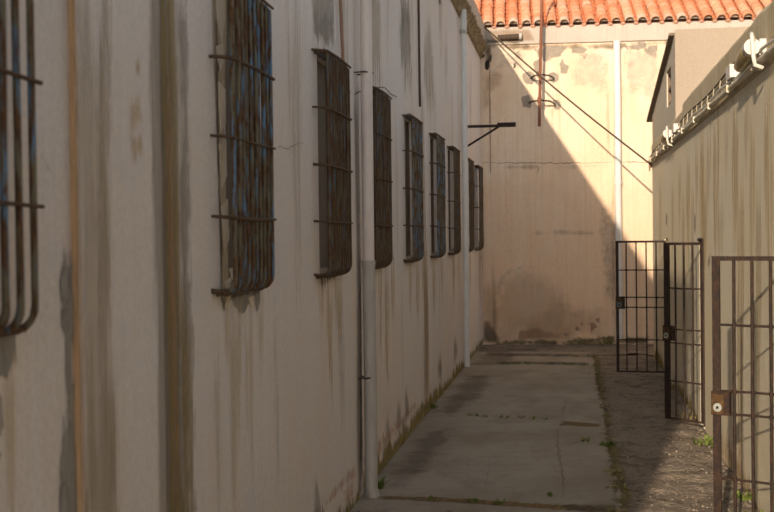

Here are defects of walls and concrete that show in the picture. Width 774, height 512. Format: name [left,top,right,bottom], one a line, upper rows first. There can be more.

flaking render [537,45,587,61]
flaking render [0,335,17,379]